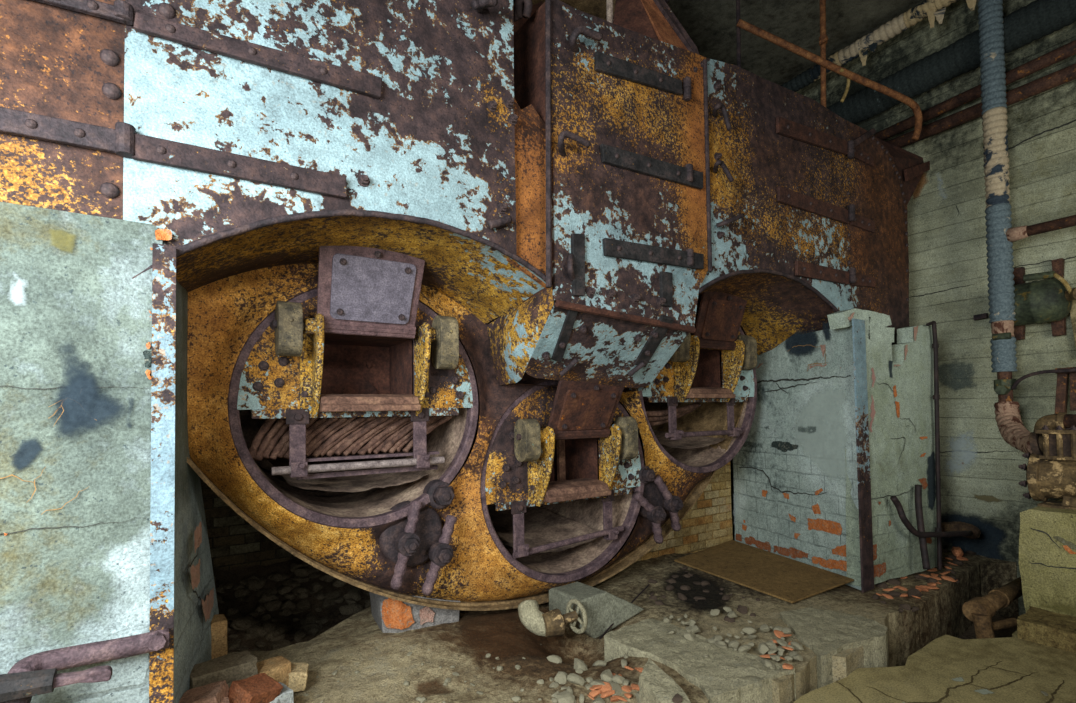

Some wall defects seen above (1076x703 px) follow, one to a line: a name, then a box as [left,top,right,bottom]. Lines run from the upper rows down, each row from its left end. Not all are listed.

damp [56,347,133,435]
damp [12,439,42,471]
crack [739,467,827,495]
spalling [735,488,847,571]
crack [1030,528,1076,569]
crack [836,661,1064,703]